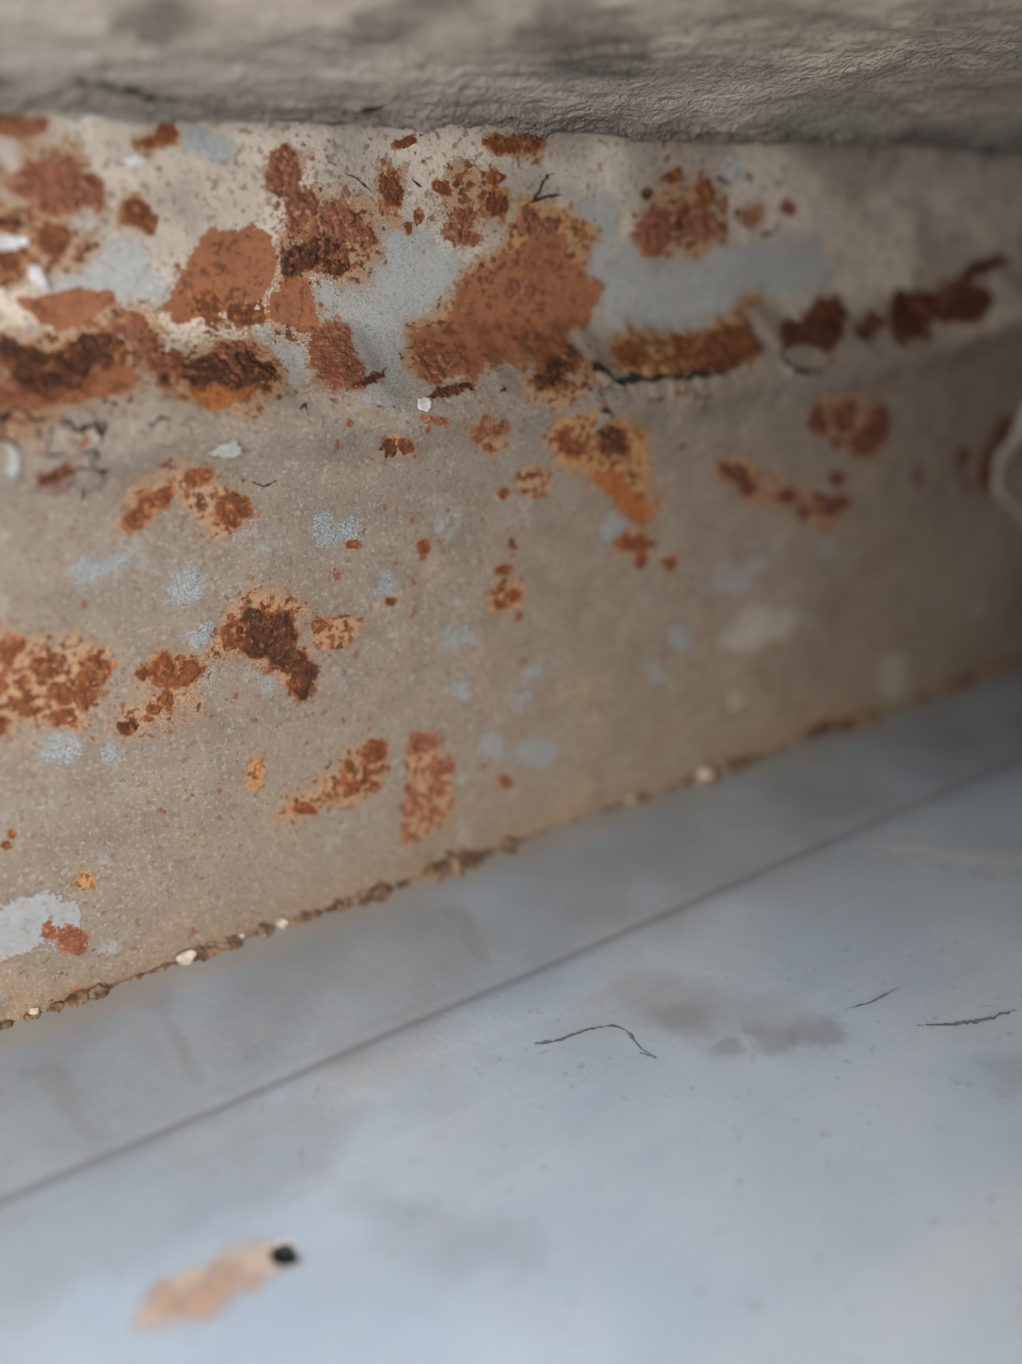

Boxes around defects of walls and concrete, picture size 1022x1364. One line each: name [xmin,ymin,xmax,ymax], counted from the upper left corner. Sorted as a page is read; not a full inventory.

rust [0,111,1017,572]
crack [591,335,825,436]
rust [385,596,398,607]
rust [485,537,530,623]
rust [0,566,371,753]
rust [238,749,268,795]
rust [268,721,461,859]
rust [0,828,17,855]
rust [68,868,97,897]
crack [851,987,899,1008]
crack [917,996,1022,1026]
crack [534,1024,657,1059]